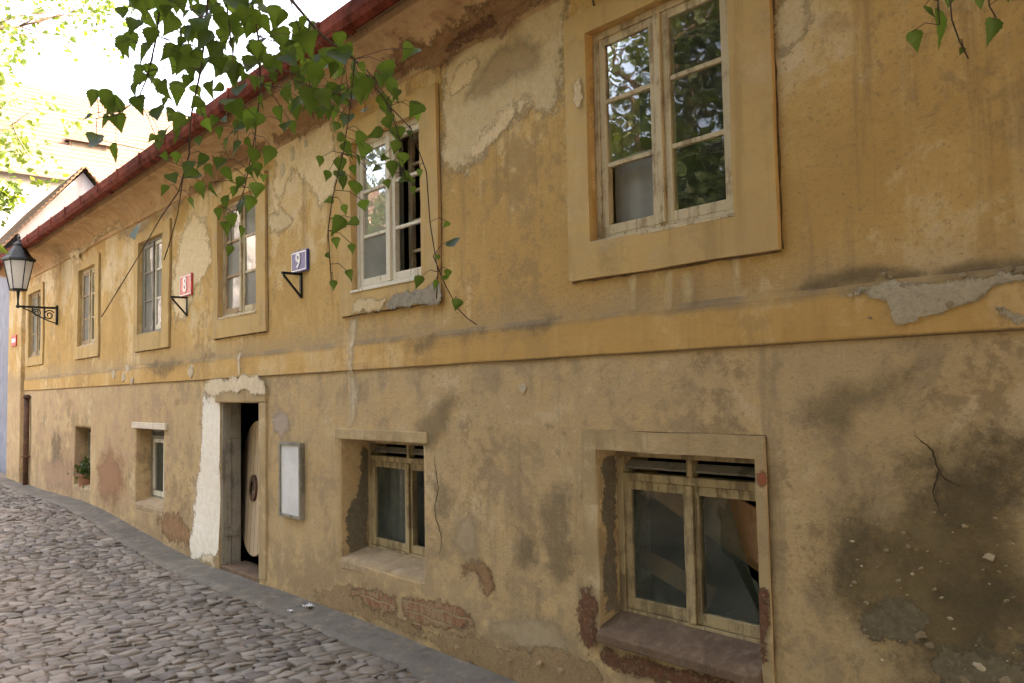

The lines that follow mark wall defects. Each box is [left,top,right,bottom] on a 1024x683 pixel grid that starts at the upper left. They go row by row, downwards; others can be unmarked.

peeling [188,0,584,235]
peeling [351,282,442,314]
spalling [839,265,1024,326]
crack [434,459,442,550]
crack [915,436,964,516]
spalling [311,446,734,683]
water stain [836,440,1024,683]